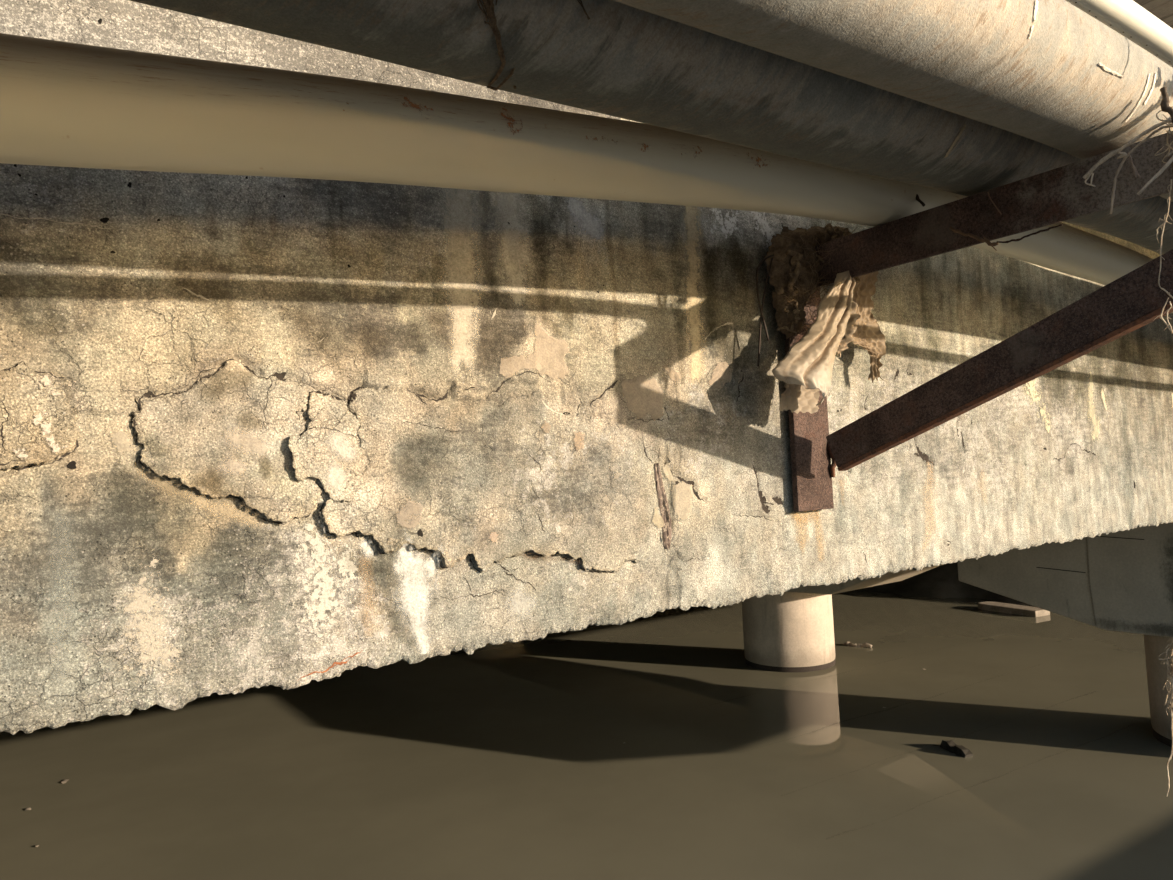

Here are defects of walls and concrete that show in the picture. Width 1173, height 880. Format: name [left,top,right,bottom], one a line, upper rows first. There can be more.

leakage [685,206,778,379]
crack [0,361,65,466]
leakage [32,413,67,458]
leakage [142,468,257,524]
crack [131,359,367,445]
peeling [112,359,693,573]
crack [403,371,550,432]
flaking render [500,324,569,380]
crack [577,380,705,502]
leakage [117,555,191,685]
leakage [278,517,373,654]
leakage [394,540,443,654]